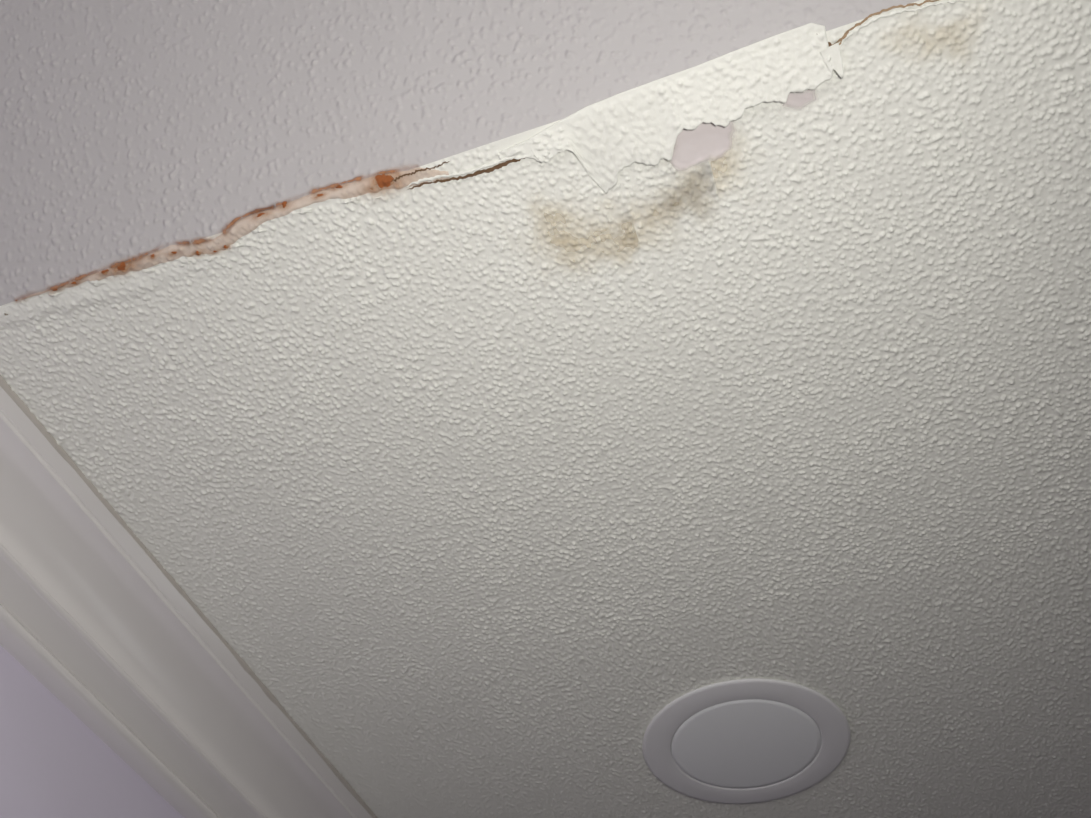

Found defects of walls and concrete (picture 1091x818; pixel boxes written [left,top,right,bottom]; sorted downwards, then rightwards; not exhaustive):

crack [828,0,970,47]
peeling [498,23,844,194]
corrosion [311,170,396,198]
crack [390,154,525,190]
corrosion [171,201,287,255]
corrosion [50,250,155,291]